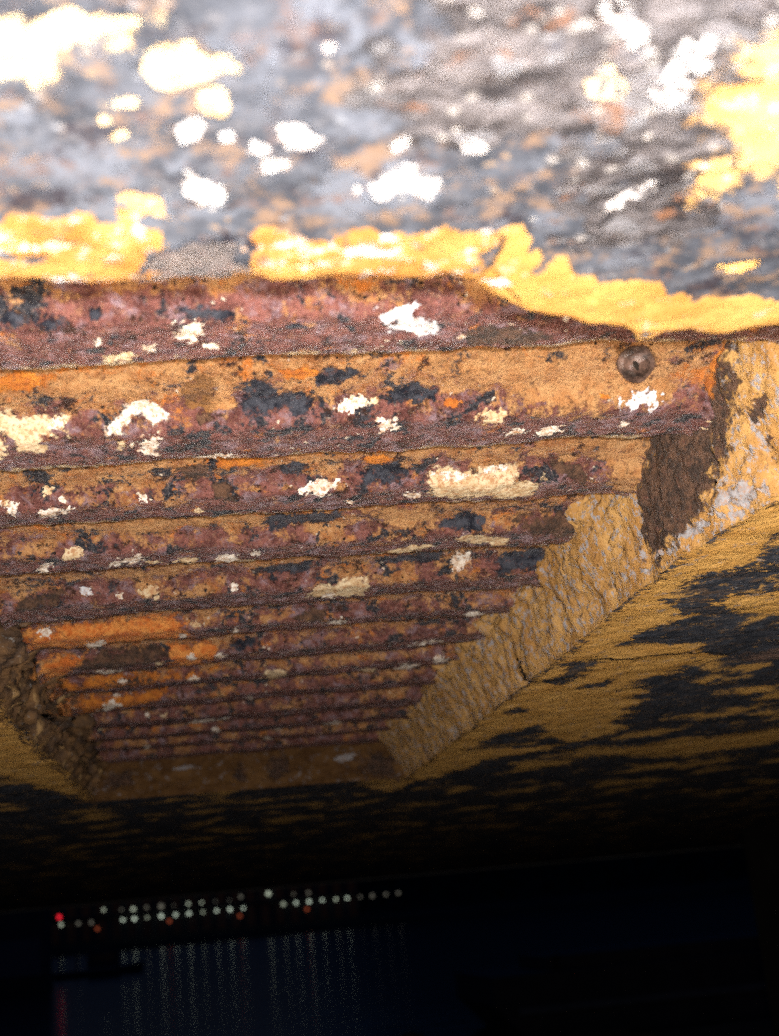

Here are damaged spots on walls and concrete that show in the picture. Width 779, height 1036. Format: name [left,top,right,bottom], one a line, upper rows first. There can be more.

spalling [225,0,779,340]
peeling [0,191,171,282]
peeling [0,407,71,460]
peeling [104,399,170,456]
corrosion [110,457,346,538]
corrosion [179,364,368,427]
corrosion [361,502,486,534]
peeling [403,461,547,501]
corrosion [385,324,690,423]
corrosion [549,340,744,572]
corrosion [16,589,262,729]
peeling [358,480,779,793]